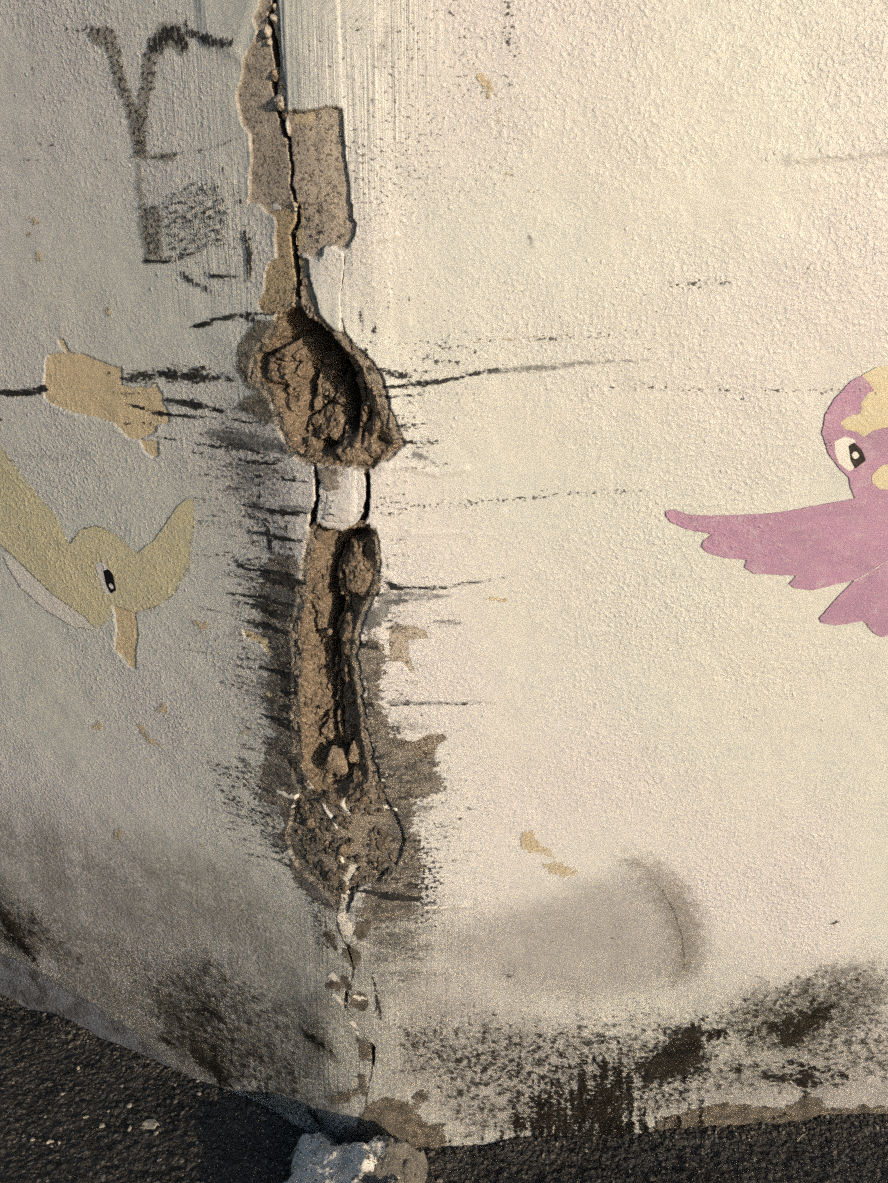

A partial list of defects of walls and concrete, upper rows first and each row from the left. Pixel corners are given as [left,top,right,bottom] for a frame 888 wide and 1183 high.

crack [261,0,306,314]
spalling [234,0,403,500]
crack [339,256,347,333]
peeling [45,339,172,457]
damp [242,474,310,543]
crack [309,455,372,533]
damp [352,570,476,652]
spalling [232,520,461,1011]
damp [356,840,451,935]
damp [132,958,336,1131]
crack [336,860,376,1117]
damp [399,970,888,1146]